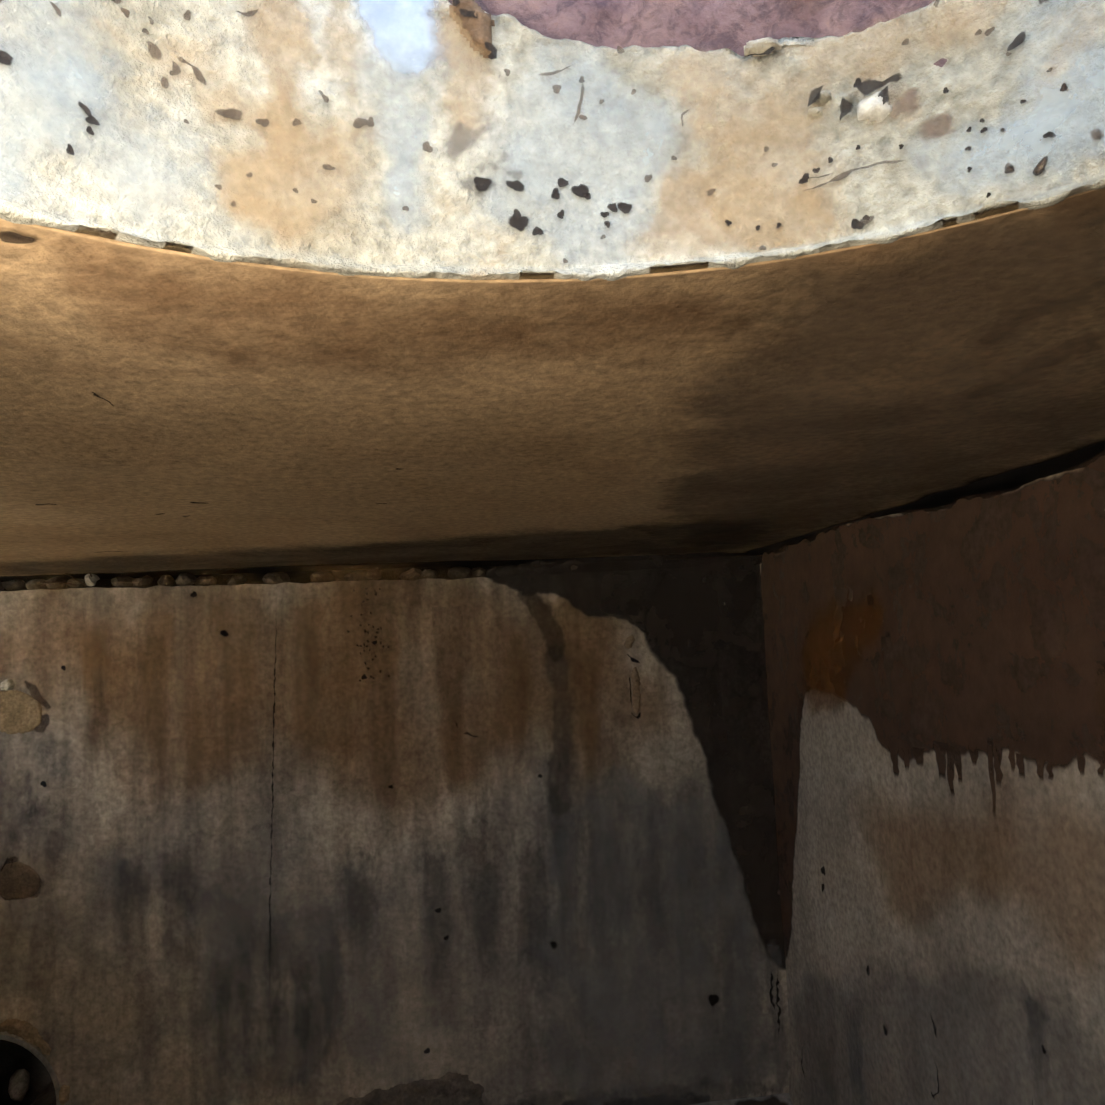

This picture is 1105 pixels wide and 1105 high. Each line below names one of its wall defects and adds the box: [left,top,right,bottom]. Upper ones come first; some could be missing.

efflorescence [360,0,444,73]
spalling [449,0,497,59]
peeling [744,37,782,57]
spalling [1006,32,1025,56]
leakage [0,216,1105,969]